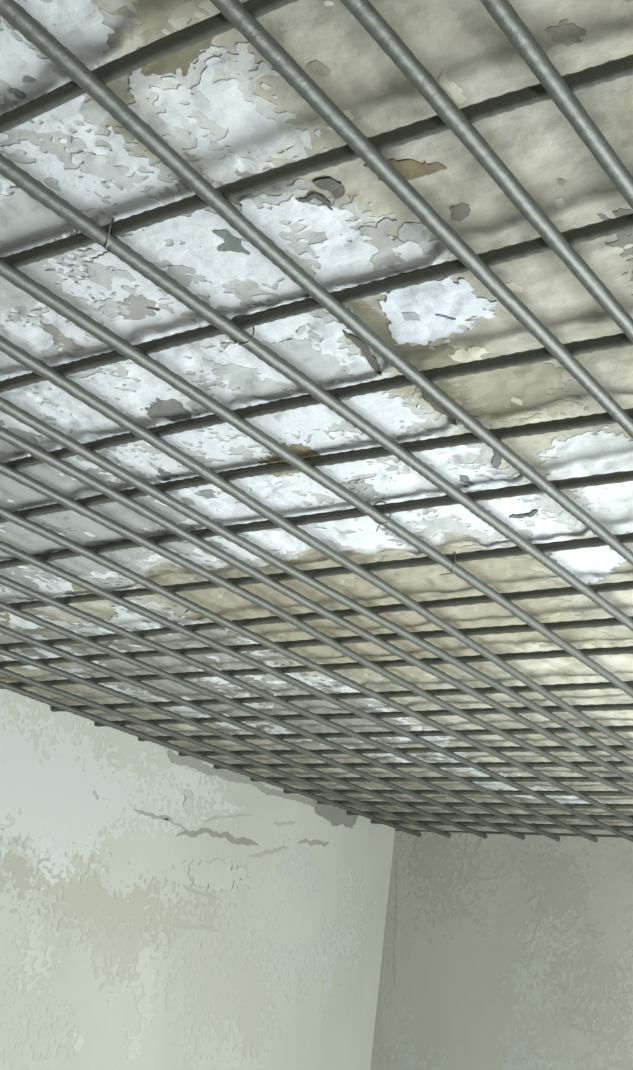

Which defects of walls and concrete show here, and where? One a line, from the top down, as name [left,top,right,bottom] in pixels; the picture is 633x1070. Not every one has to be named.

crack [135,809,330,858]
spalling [0,0,633,842]